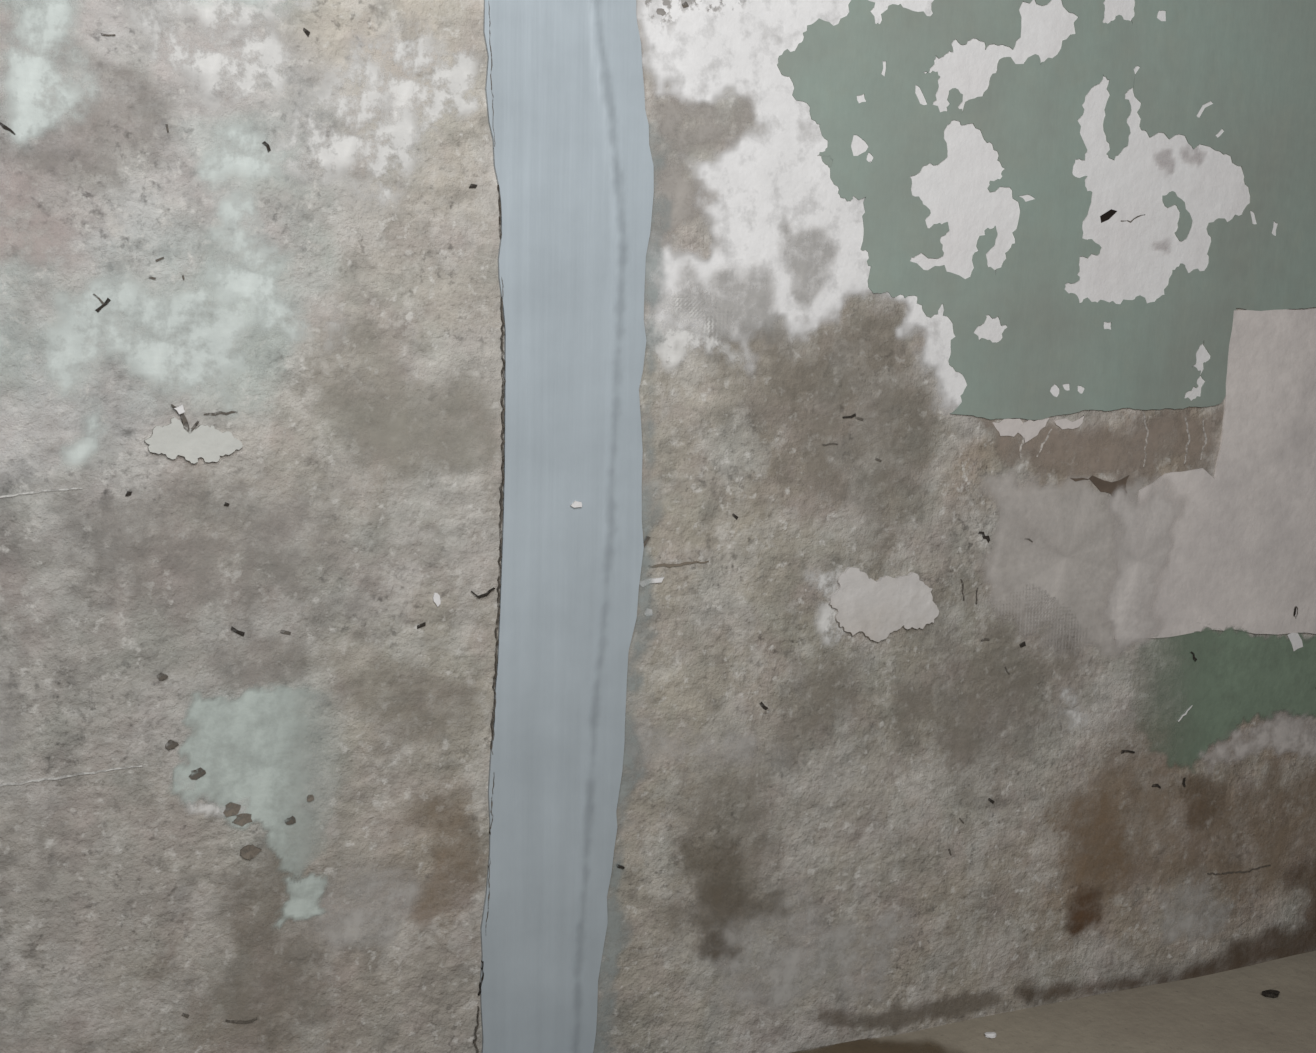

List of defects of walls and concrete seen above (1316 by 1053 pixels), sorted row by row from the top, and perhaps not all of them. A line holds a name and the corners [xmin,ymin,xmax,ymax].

damp [6,0,93,142]
damp [131,0,309,104]
damp [210,193,305,339]
damp [646,296,739,368]
peeling [636,0,967,408]
peeling [910,0,1078,279]
peeling [1065,66,1256,304]
damp [65,416,99,464]
peeling [144,404,243,464]
peeling [810,567,939,644]
peeling [165,686,327,927]
damp [710,887,897,1003]